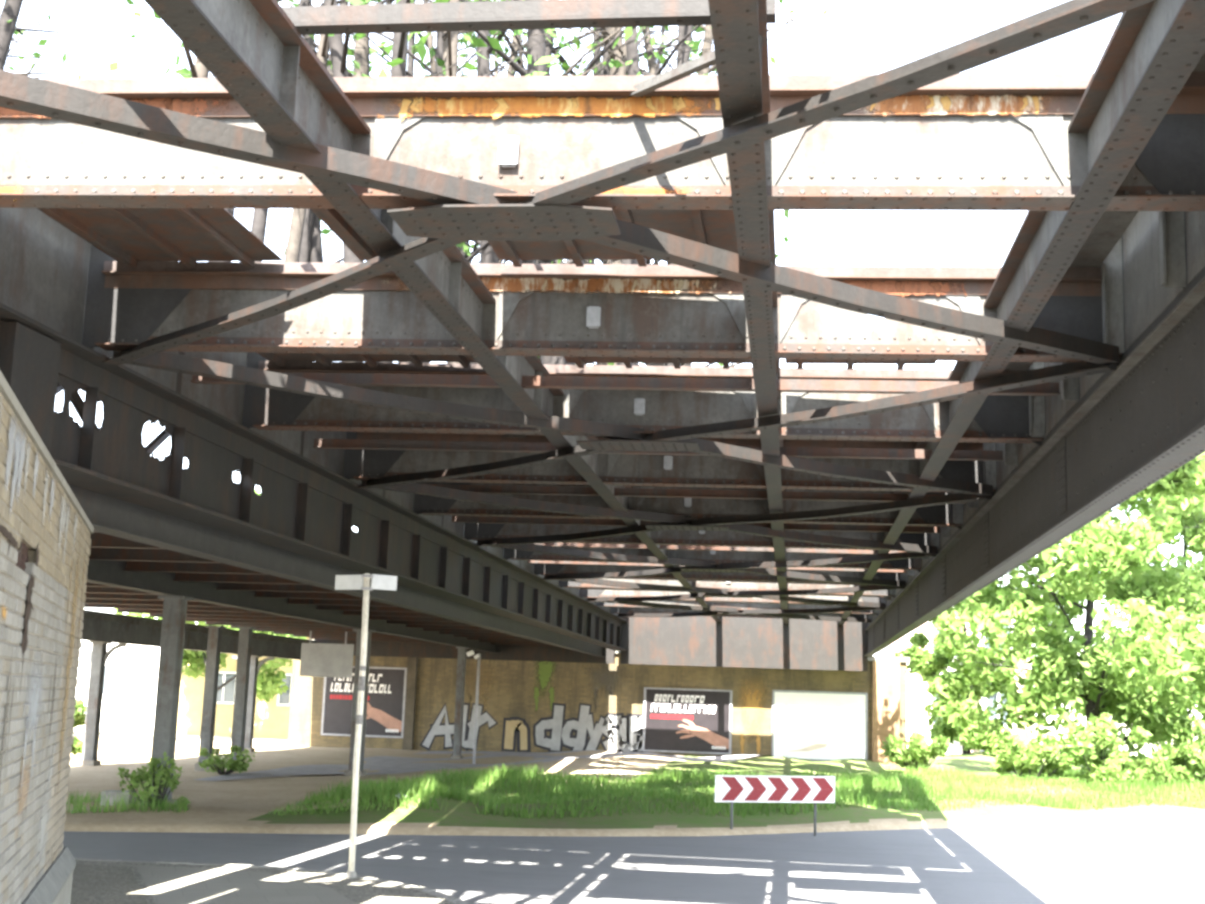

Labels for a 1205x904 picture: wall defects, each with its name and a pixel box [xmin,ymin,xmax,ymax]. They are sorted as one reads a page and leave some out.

corrosion [394,96,720,120]
corrosion [859,94,1050,117]
corrosion [0,187,21,201]
corrosion [601,186,685,194]
corrosion [480,277,731,295]
leakage [6,425,77,561]